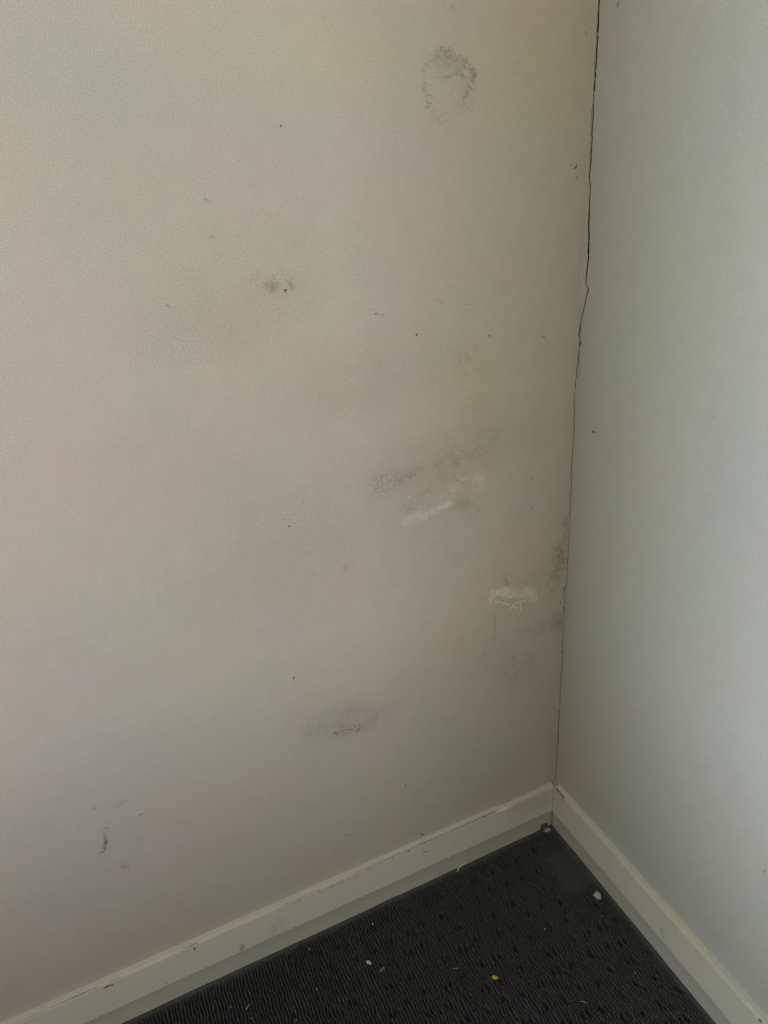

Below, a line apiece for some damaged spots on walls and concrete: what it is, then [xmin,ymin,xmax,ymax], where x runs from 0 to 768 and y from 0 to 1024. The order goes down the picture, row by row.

damp [420,43,483,127]
crack [347,0,601,877]